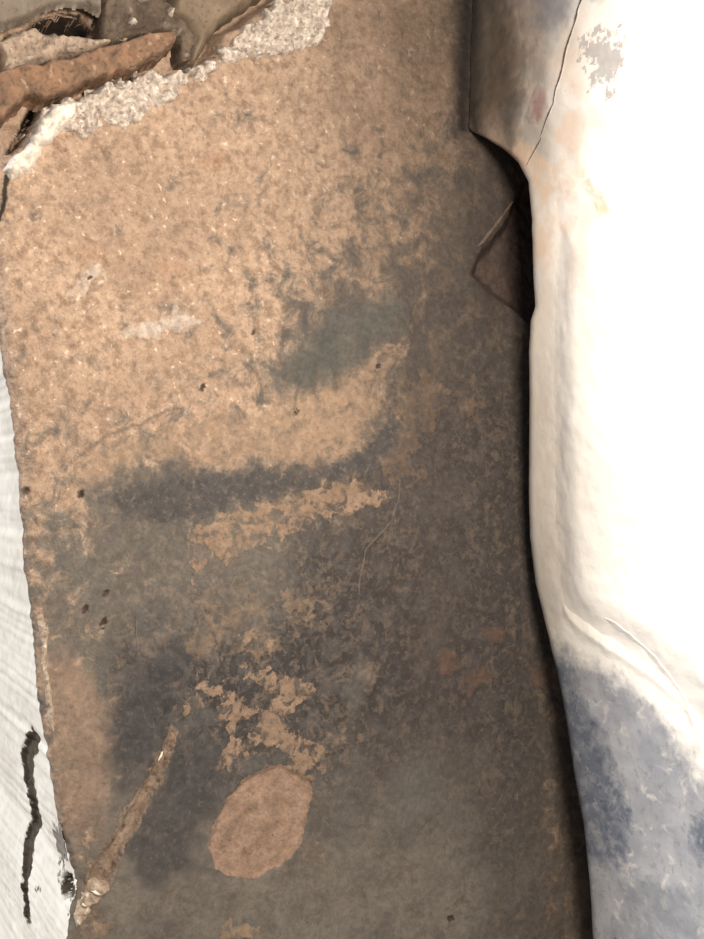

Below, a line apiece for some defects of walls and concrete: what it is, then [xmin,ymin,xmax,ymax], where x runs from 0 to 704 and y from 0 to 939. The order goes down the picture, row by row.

spalling [33,0,334,138]
crack [526,0,584,166]
leakage [64,263,109,299]
efflorescence [118,303,205,344]
leakage [268,286,414,411]
leakage [95,407,403,525]
leakage [332,656,382,719]
peeling [20,614,179,928]